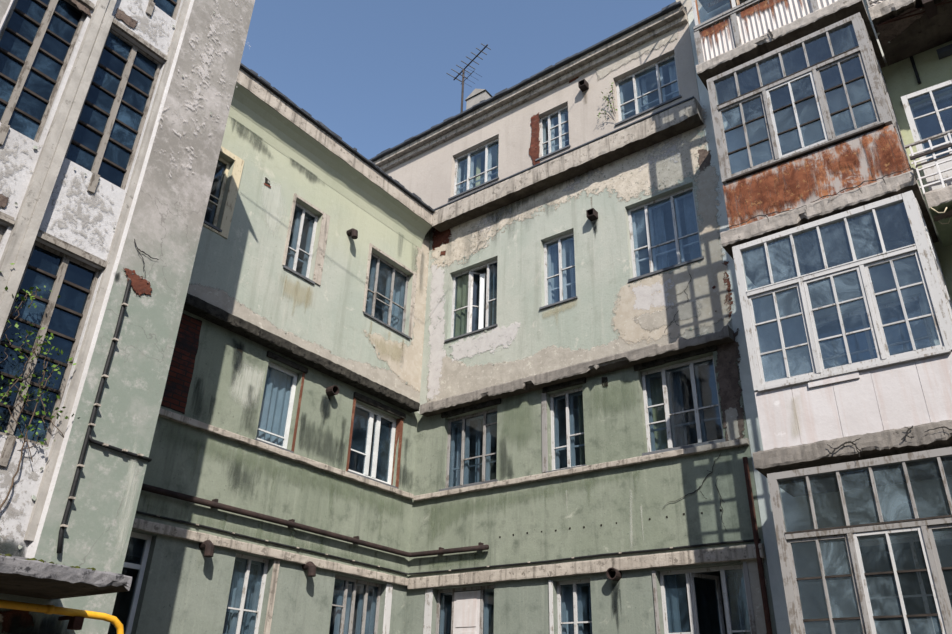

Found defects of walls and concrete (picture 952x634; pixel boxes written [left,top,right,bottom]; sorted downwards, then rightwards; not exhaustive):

corrosion [741,0,803,32]
corrosion [701,19,729,47]
corrosion [829,131,909,176]
corrosion [723,160,820,224]
flaking render [124,268,152,296]
peeling [187,108,745,447]
crack [826,438,862,457]
crack [901,426,952,440]
crack [668,453,726,530]